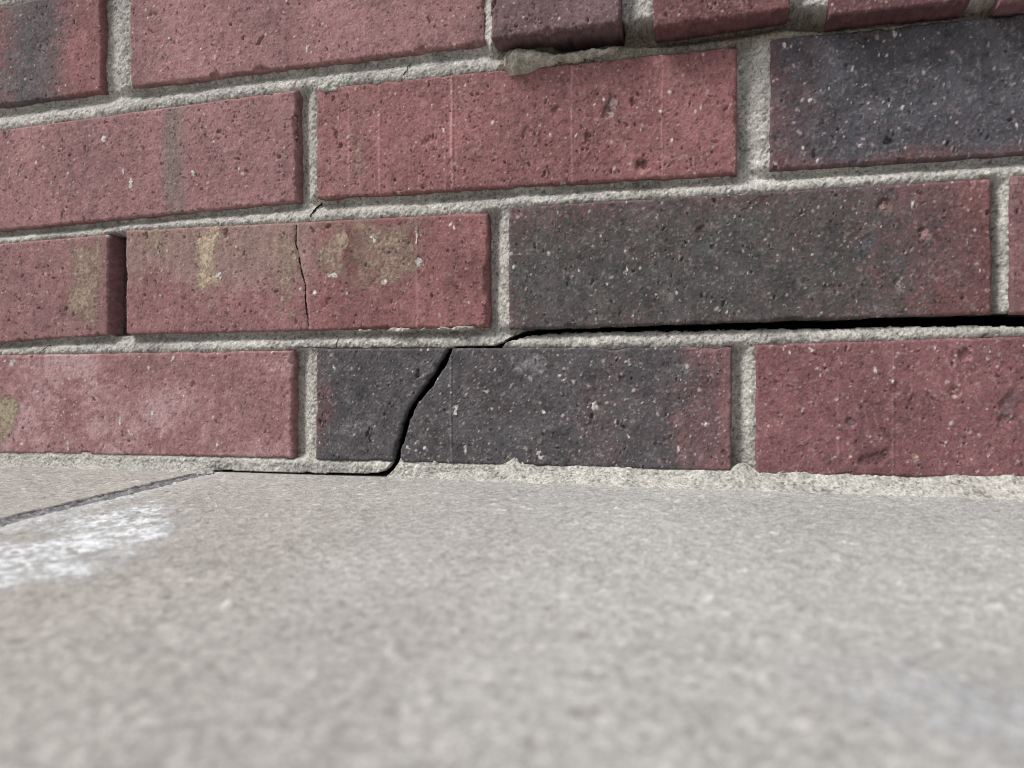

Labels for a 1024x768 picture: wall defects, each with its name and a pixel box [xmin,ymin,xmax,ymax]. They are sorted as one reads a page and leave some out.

crack [295,203,1024,474]